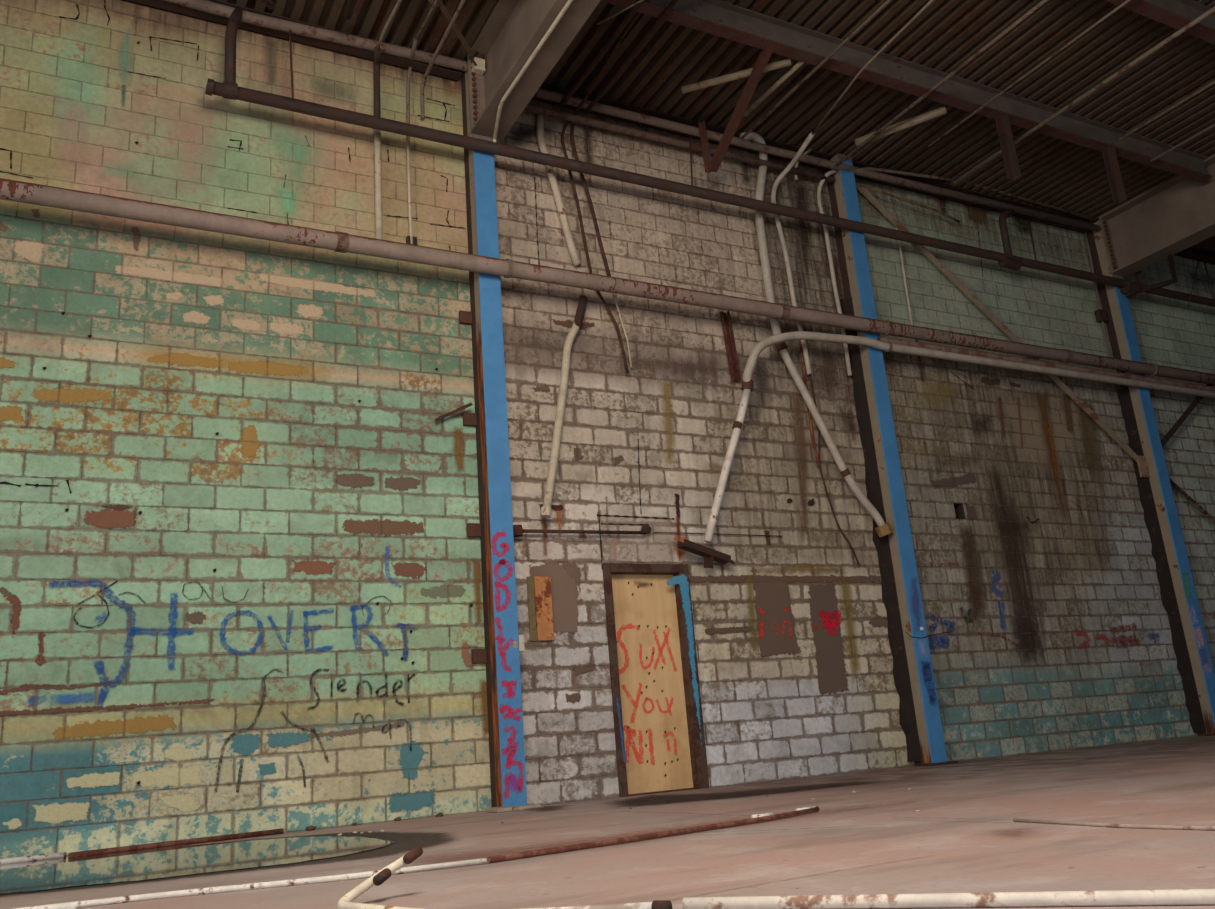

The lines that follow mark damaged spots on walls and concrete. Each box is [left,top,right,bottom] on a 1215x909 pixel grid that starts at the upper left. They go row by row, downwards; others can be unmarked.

peeling [115,265,224,327]
peeling [231,272,376,336]
rust [1039,395,1065,515]
spalling [84,505,137,530]
spalling [342,518,424,536]
leakage [962,530,983,617]
leakage [994,476,1036,652]
spalling [0,587,22,638]
peeling [3,747,202,829]
peeling [0,699,214,741]
peeling [231,722,404,775]
peeling [388,740,436,812]